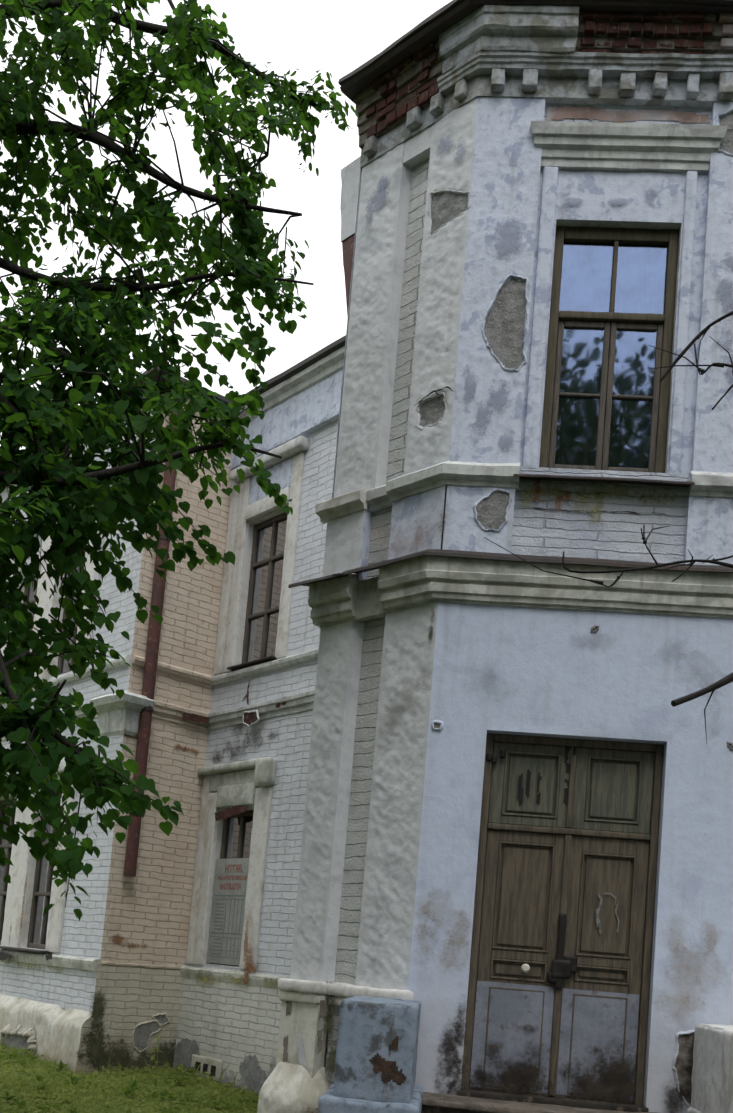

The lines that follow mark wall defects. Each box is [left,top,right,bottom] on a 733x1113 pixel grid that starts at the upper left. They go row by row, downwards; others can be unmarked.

flaking render [546,106,733,157]
flaking render [428,189,471,238]
flaking render [464,274,530,434]
flaking render [416,392,447,430]
flaking render [472,488,513,533]
flaking render [369,1036,407,1085]